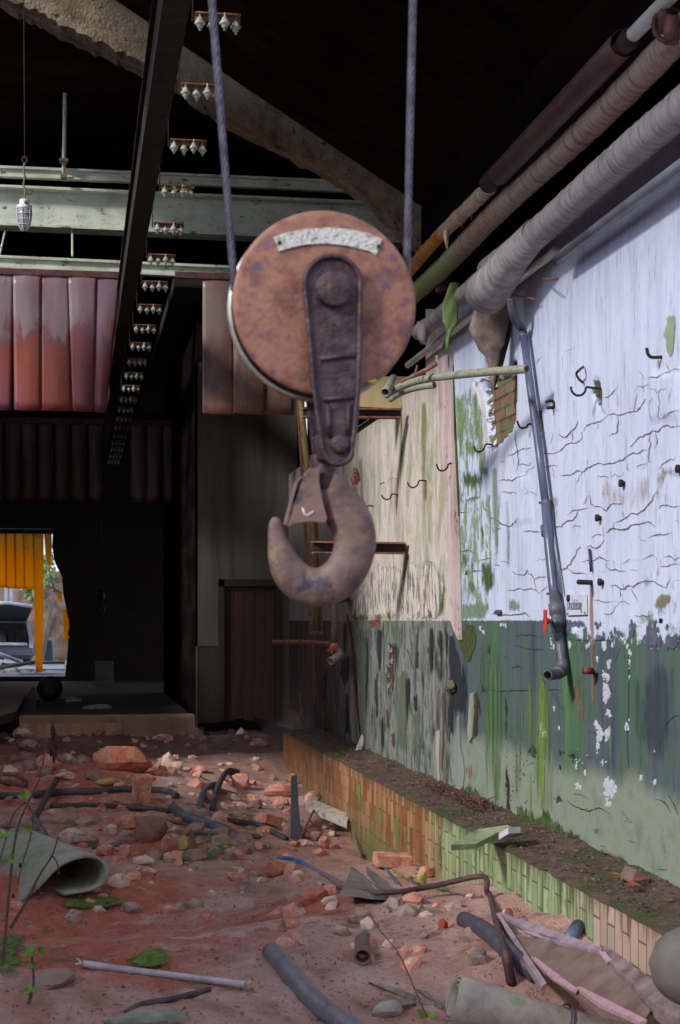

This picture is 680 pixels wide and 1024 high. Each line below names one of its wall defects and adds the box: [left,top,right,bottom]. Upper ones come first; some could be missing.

damp [466,395,481,455]
spalling [472,360,518,450]
crack [459,363,679,692]
damp [469,563,494,592]
damp [374,625,421,751]
damp [435,715,465,790]
peeling [559,639,632,807]